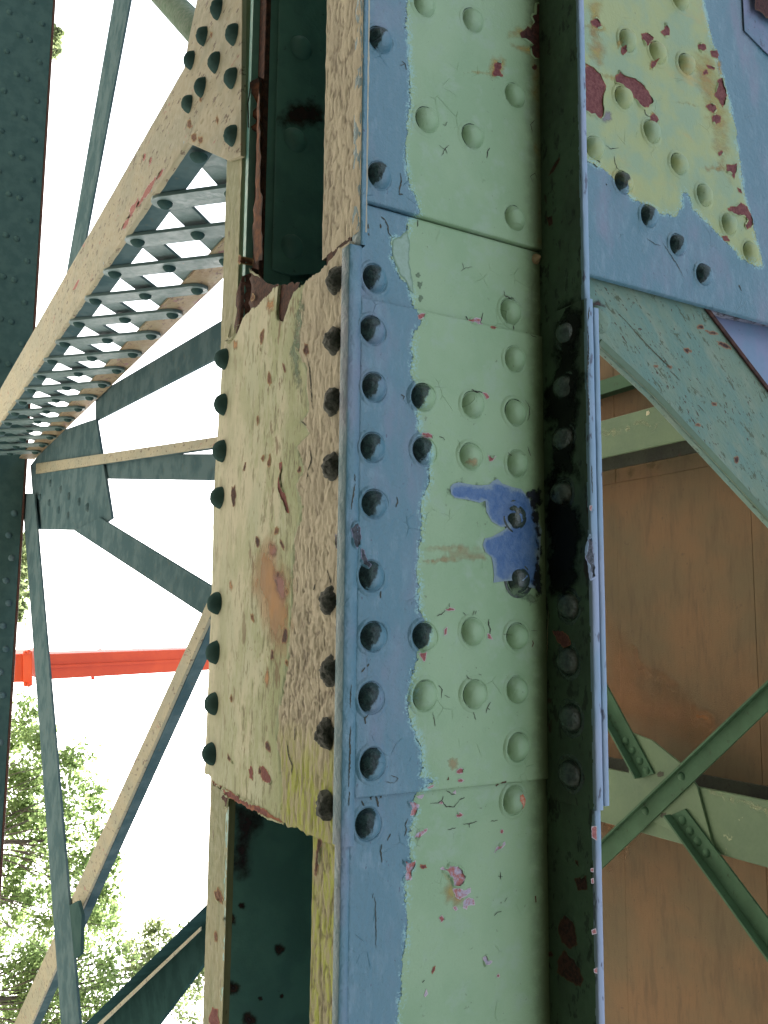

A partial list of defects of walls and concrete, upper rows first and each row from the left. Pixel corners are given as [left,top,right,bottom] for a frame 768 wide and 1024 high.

corrosion [518,2,539,70]
corrosion [281,101,323,127]
corrosion [225,76,300,349]
corrosion [255,544,287,641]
corrosion [212,781,284,876]
peeling [402,859,427,884]
peeling [439,862,475,923]
corrosion [549,913,584,987]